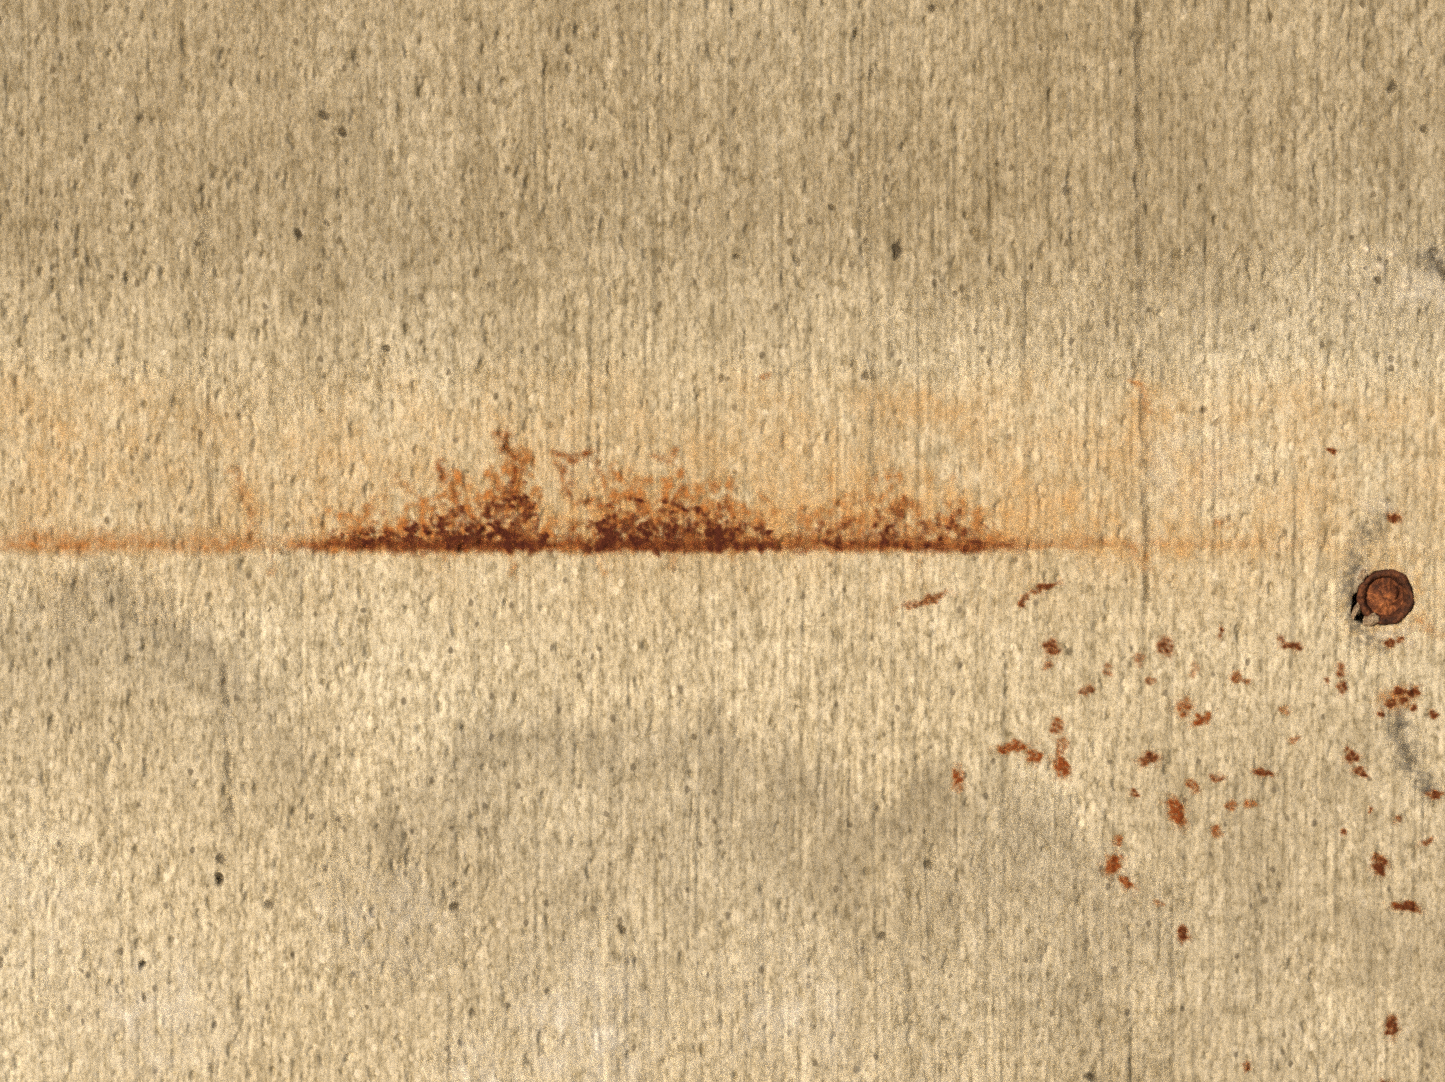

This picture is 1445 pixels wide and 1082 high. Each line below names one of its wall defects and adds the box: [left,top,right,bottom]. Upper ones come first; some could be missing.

corrosion [9,534,251,551]
corrosion [288,432,1077,556]